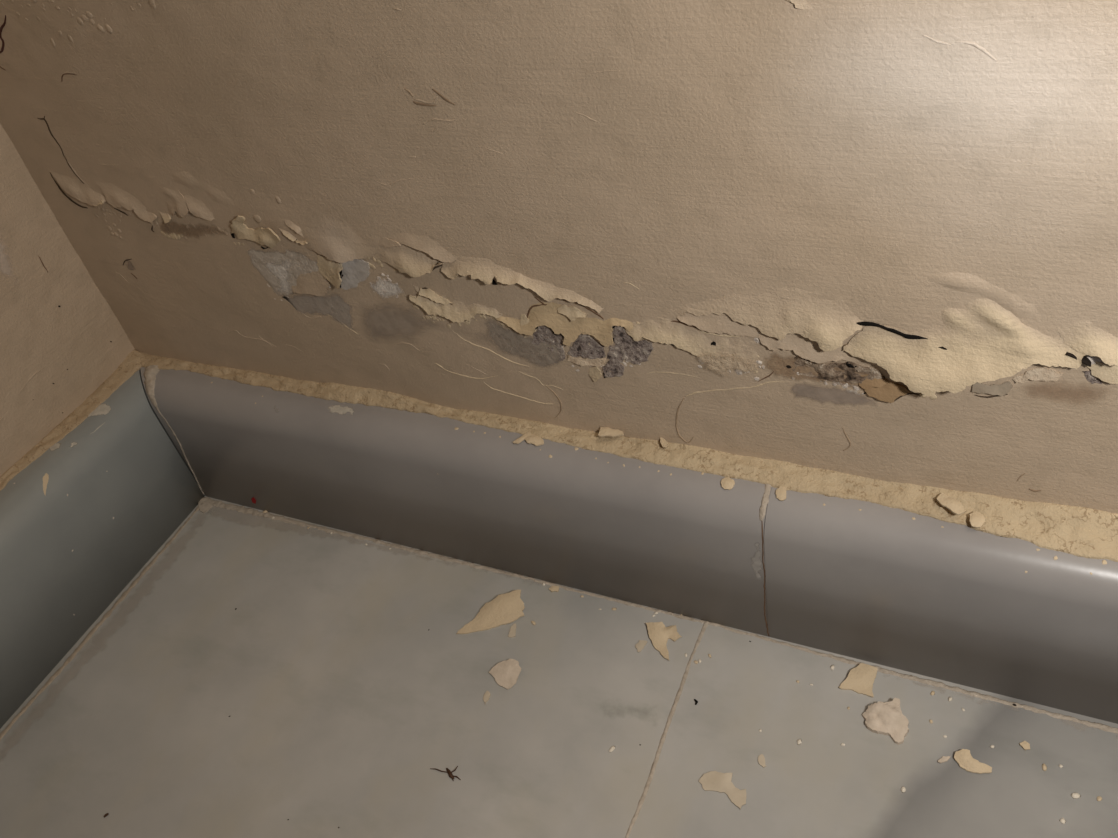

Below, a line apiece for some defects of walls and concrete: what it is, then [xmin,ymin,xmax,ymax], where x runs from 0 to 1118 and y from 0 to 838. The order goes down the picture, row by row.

crack [0,15,8,71]
peeling [49,170,1118,403]
crack [761,522,769,636]